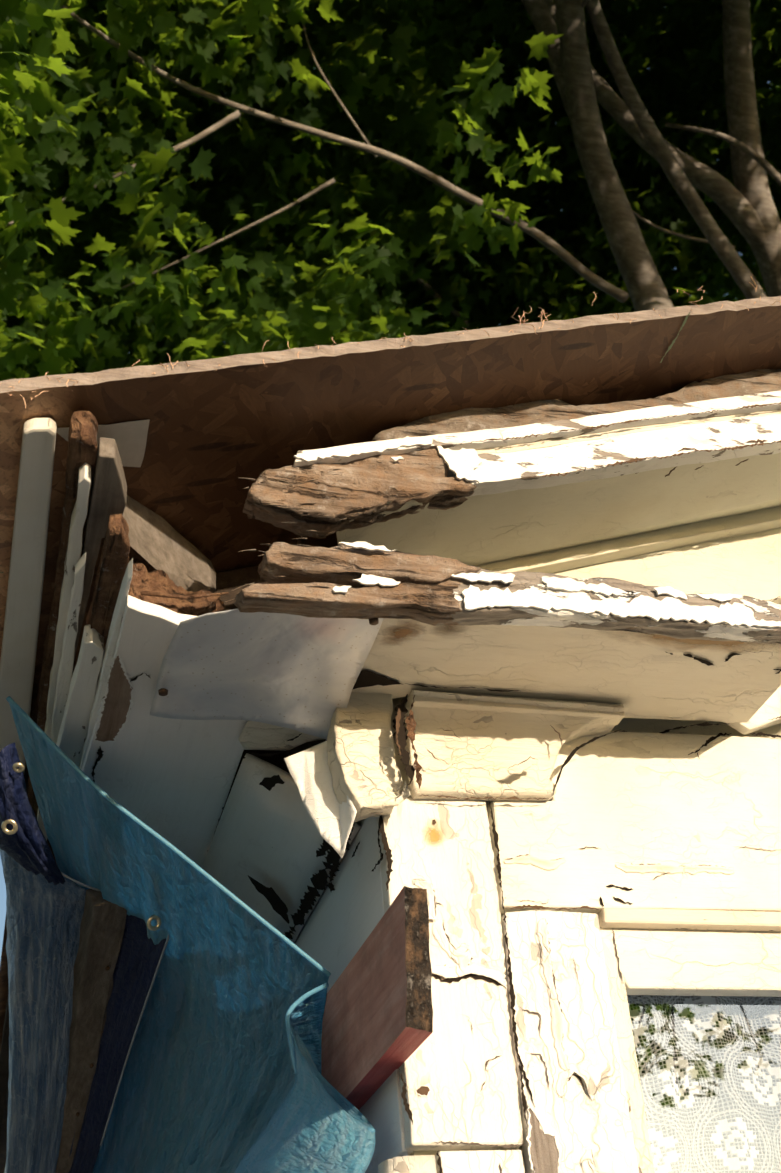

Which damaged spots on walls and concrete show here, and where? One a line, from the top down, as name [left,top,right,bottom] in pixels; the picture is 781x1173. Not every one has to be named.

peeling [294,436,482,483]
peeling [338,542,397,553]
peeling [332,574,401,593]
peeling [451,571,781,628]
crack [666,642,781,674]
peeling [93,655,134,742]
crack [392,683,525,789]
crack [660,716,781,759]
crack [507,756,538,774]
crack [285,799,774,1173]